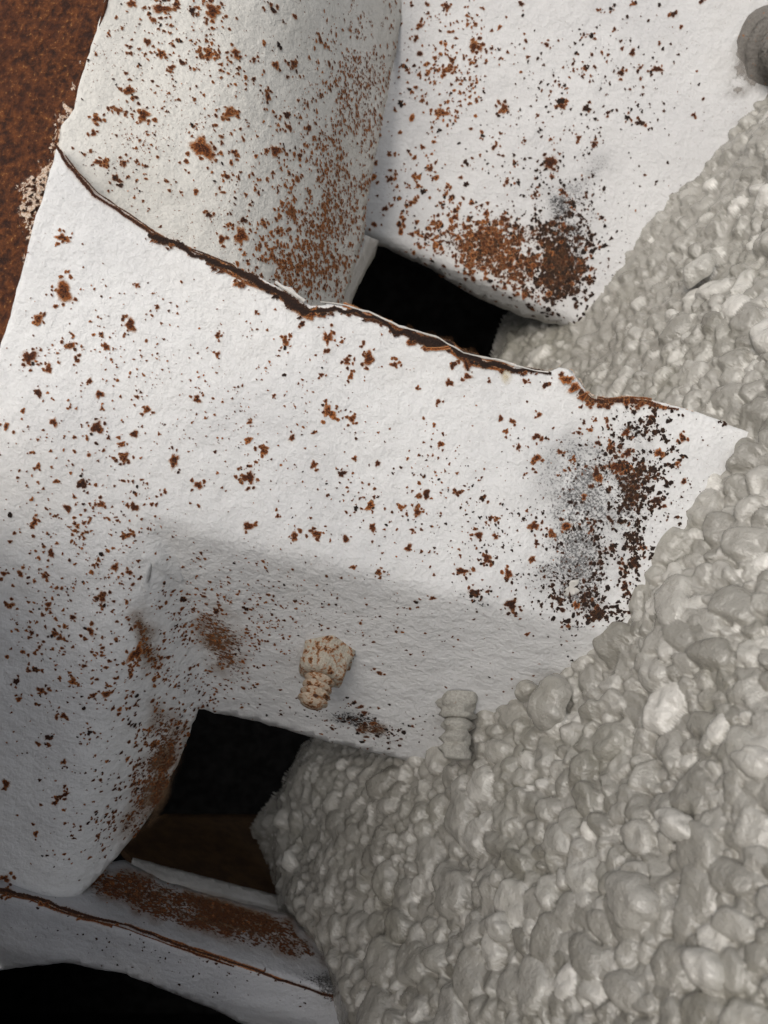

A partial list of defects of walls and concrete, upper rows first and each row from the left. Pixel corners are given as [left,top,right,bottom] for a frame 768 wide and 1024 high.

corrosion [54,228,84,247]
crack [54,122,161,236]
corrosion [71,0,688,443]
corrosion [0,270,436,998]
corrosion [275,389,704,662]